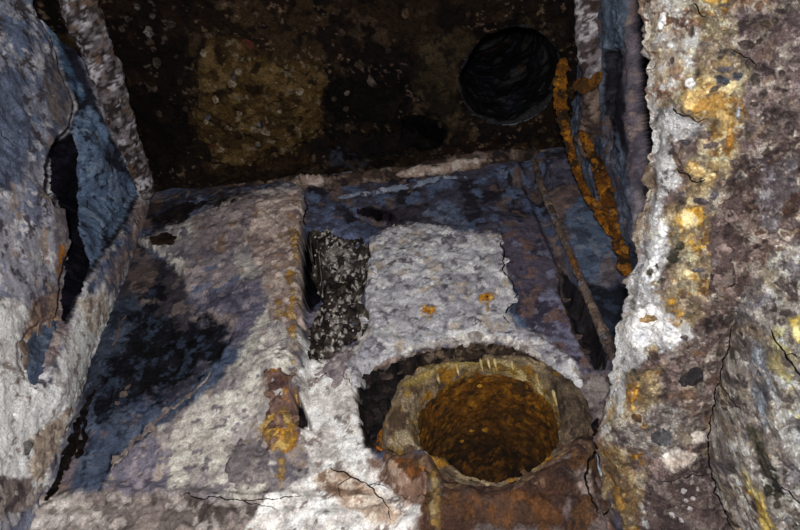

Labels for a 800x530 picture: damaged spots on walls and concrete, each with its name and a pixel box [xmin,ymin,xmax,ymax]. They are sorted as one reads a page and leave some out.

rust [680,62,737,184]
rust [552,58,632,277]
rust [673,206,708,252]
leakage [138,276,169,302]
rust [274,221,302,338]
rust [260,405,296,480]
crack [664,319,743,530]
crack [180,492,301,510]
crack [330,467,391,519]